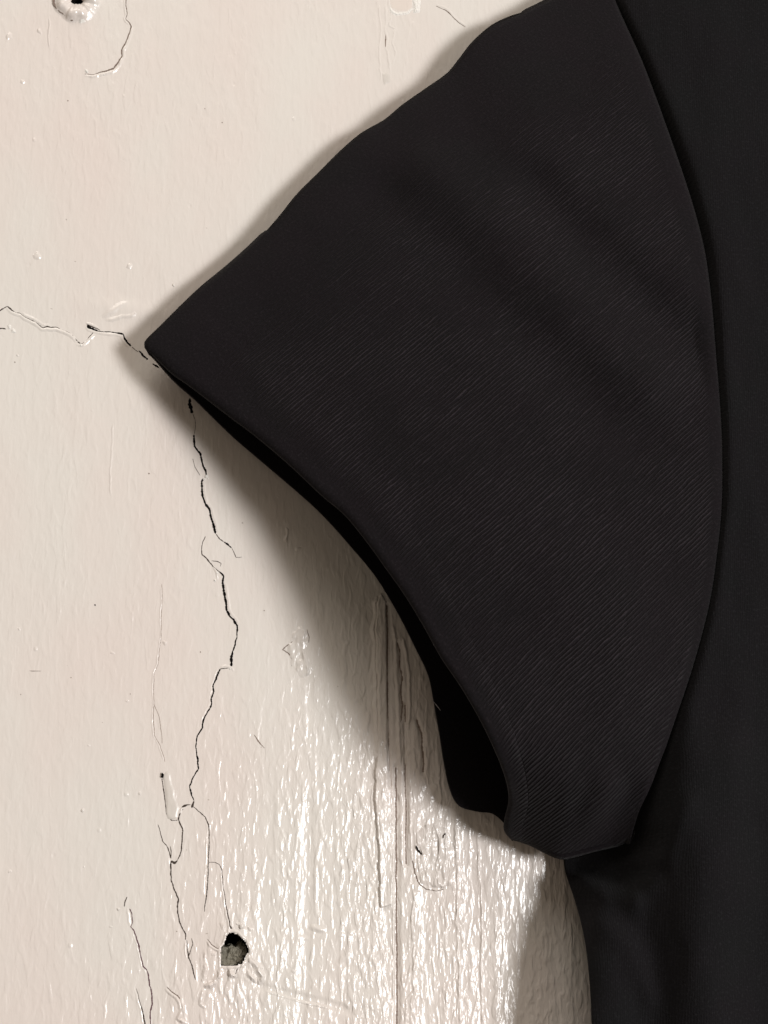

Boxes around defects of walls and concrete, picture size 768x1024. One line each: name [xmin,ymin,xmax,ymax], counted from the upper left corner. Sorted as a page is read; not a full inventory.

crack [85,0,134,79]
crack [0,306,159,368]
crack [124,398,240,1024]
spalling [210,923,253,966]